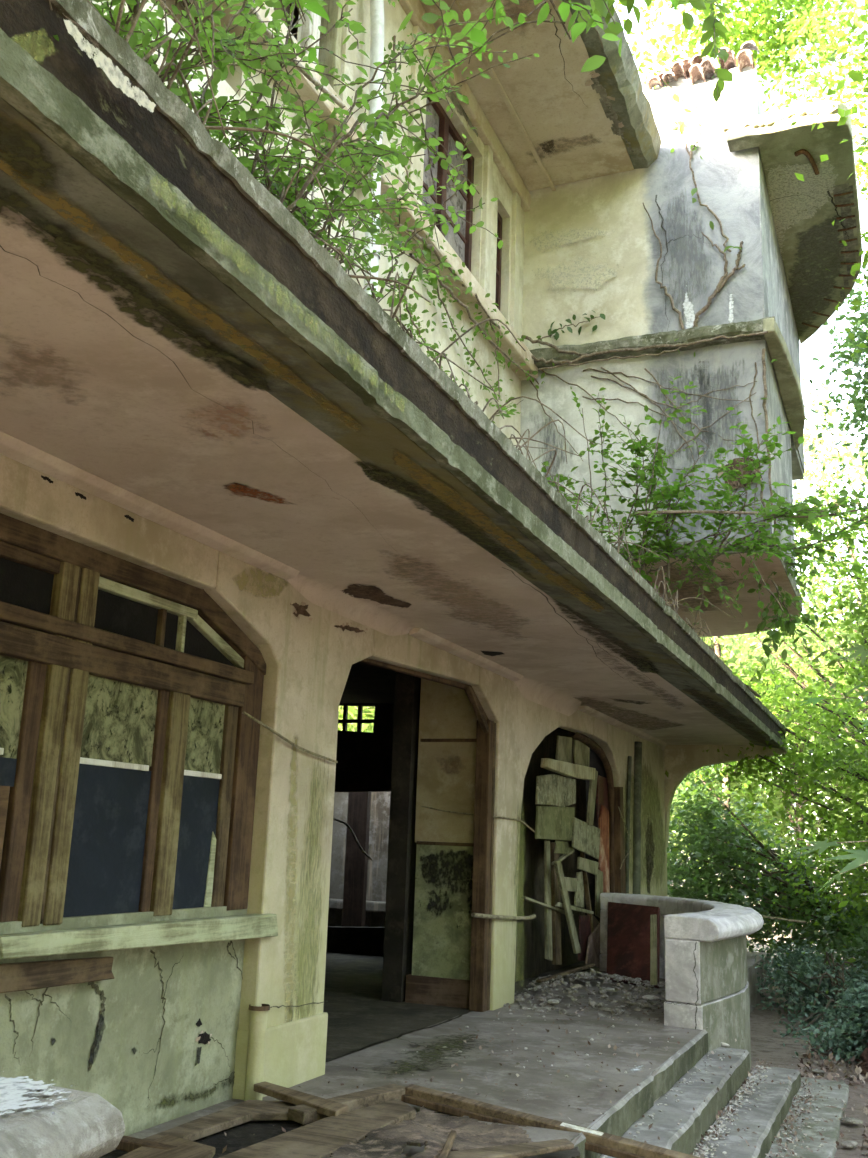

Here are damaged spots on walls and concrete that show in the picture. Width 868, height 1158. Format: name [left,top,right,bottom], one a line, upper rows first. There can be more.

damp [661,194,707,329]
damp [788,216,845,336]
crack [0,245,414,564]
damp [656,360,745,465]
corrosion [225,483,293,504]
peeling [290,601,313,621]
peeling [341,584,412,610]
damp [285,738,297,1022]
crack [5,981,106,1071]
crack [141,950,184,1107]
spalling [195,1018,212,1066]